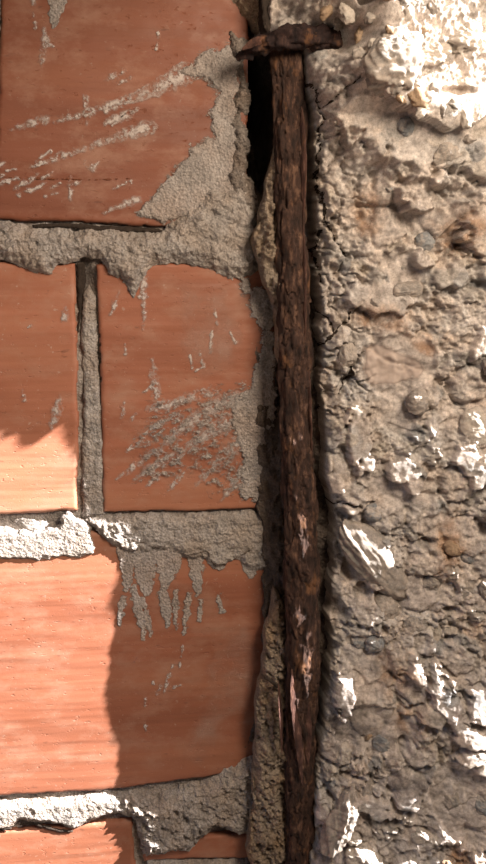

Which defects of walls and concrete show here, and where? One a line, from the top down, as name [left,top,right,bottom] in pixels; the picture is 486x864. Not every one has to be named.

corrosion [242,36,264,50]
crack [305,77,361,283]
crack [316,311,351,346]
crack [338,358,359,394]
spalling [254,0,486,864]
corrosion [278,669,312,784]